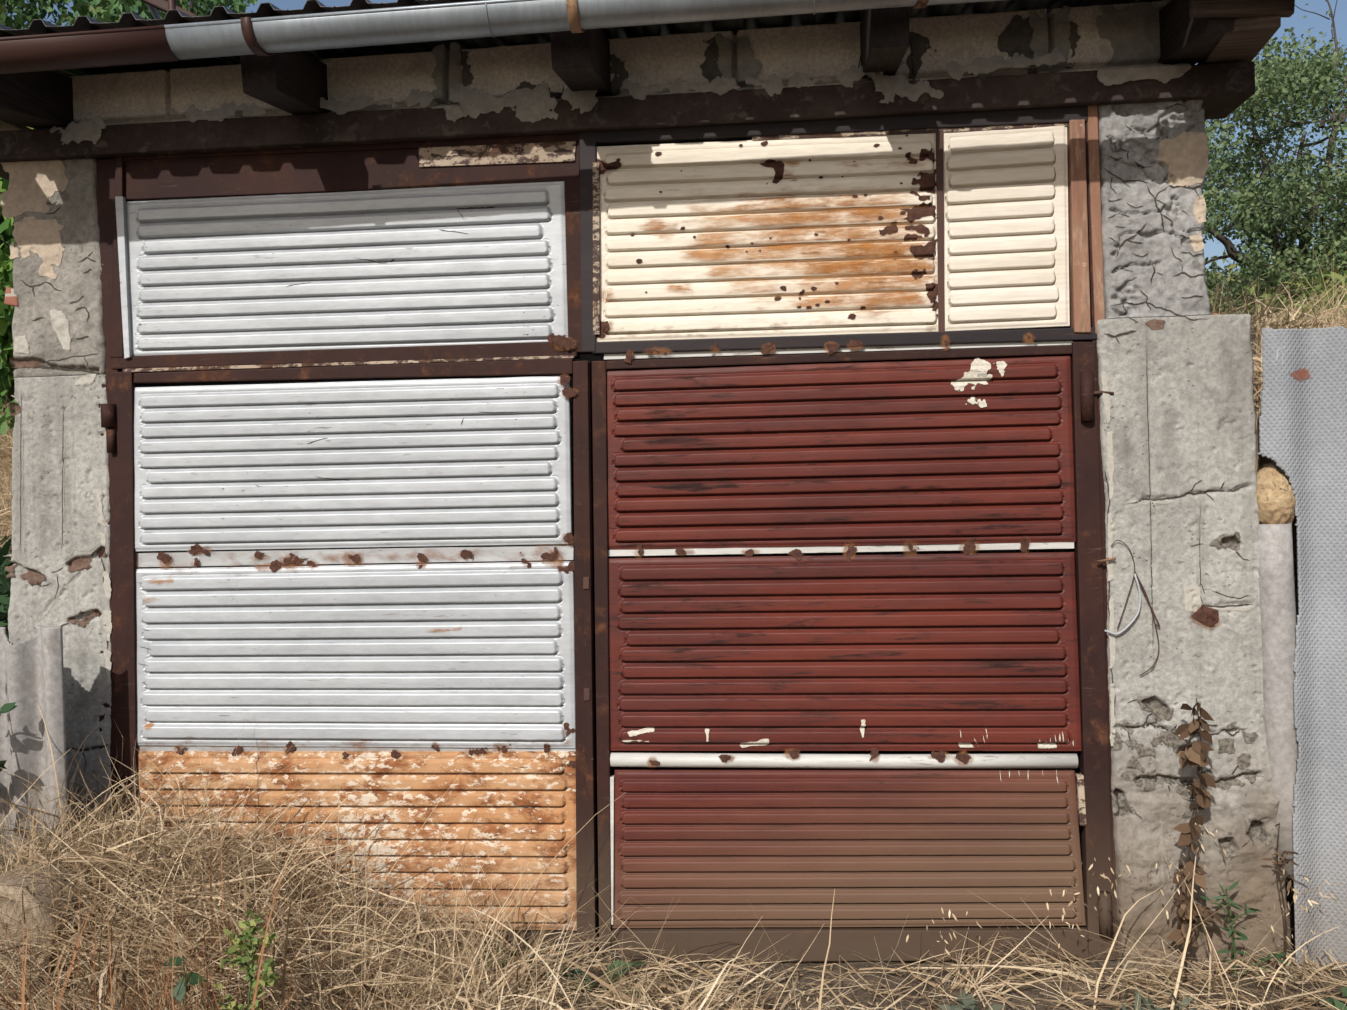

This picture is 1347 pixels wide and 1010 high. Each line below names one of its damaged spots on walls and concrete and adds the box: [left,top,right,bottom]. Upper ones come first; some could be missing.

corrosion [739,123,1069,149]
flaking render [0,160,69,279]
crack [1104,64,1206,344]
flaking render [1157,131,1210,252]
corrosion [631,183,933,313]
peeling [951,358,1007,408]
corrosion [189,543,209,566]
corrosion [254,551,361,572]
corrosion [520,532,574,574]
spalling [4,492,112,685]
corrosion [468,743,511,755]
spalling [1111,786,1142,819]